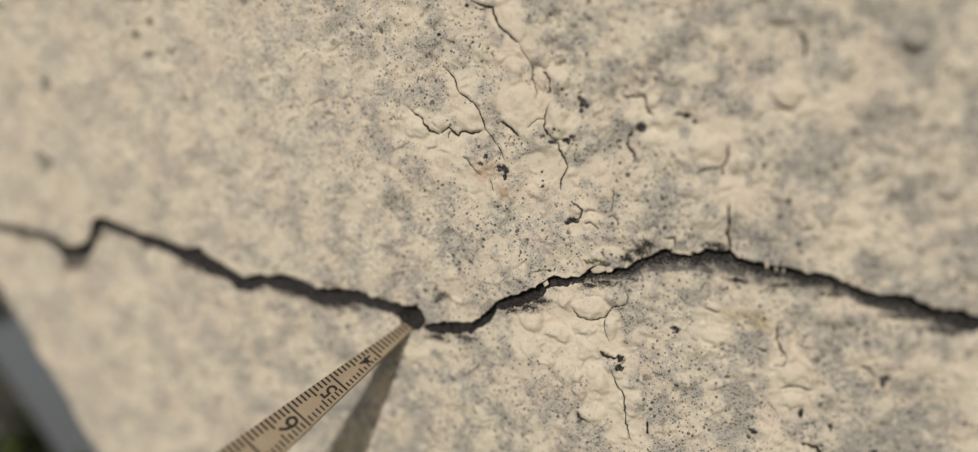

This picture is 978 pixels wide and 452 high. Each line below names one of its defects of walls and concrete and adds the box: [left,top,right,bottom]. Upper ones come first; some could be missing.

crack [799,32,808,58]
crack [410,1,575,190]
crack [624,94,654,116]
crack [627,132,635,158]
crack [698,145,730,175]
crack [0,191,978,439]